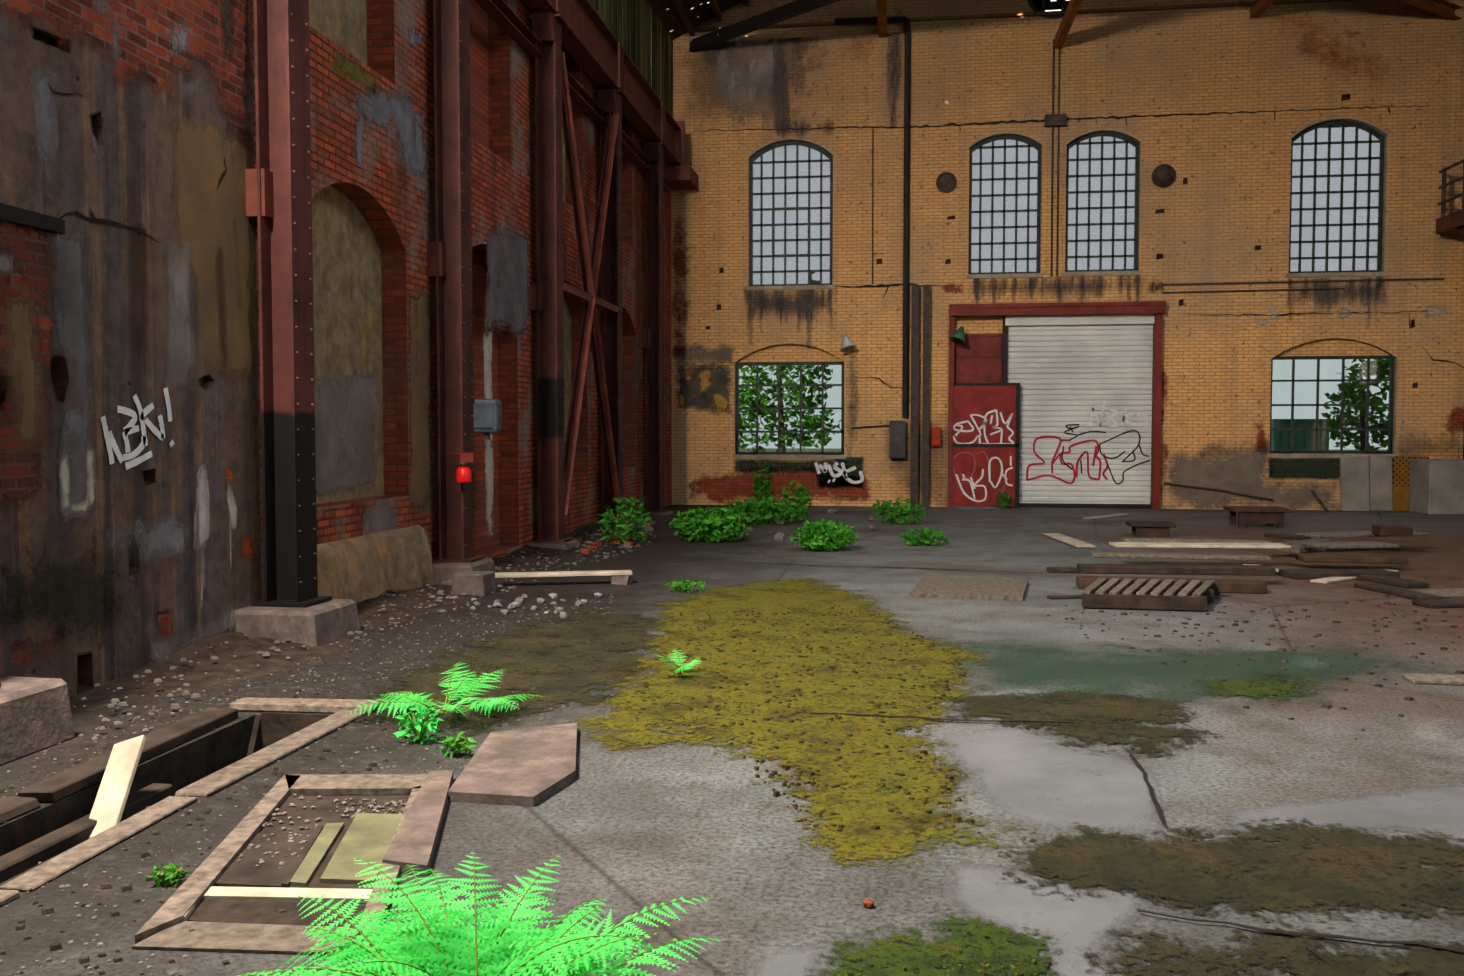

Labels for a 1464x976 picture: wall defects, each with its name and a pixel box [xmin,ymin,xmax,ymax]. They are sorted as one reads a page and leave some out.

peeling [33,71,58,175]
spalling [89,109,103,156]
flaking render [0,0,252,146]
peeling [356,89,426,174]
leakage [716,40,805,135]
peeling [483,227,529,399]
leakage [747,289,831,343]
leakage [974,275,1140,303]
leakage [1289,281,1384,306]
flaking render [0,220,94,519]
peeling [485,433,494,537]